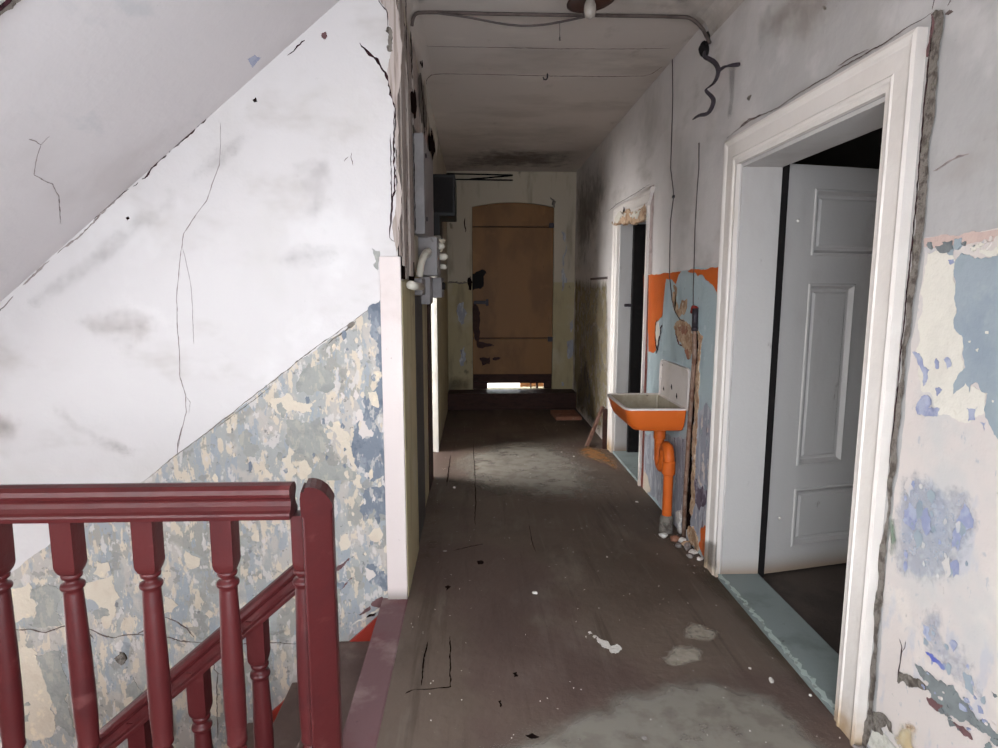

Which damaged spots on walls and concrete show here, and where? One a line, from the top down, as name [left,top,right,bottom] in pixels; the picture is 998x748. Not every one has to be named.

crack [360,44,396,241]
crack [727,0,953,138]
crack [0,120,378,480]
peeling [141,301,388,642]
peeling [612,185,718,558]
peeling [862,10,998,748]
peeling [8,544,77,748]
peeling [80,522,147,729]
peeling [172,689,194,748]
peeling [158,521,220,669]
peeling [210,659,229,748]
peeling [268,596,297,710]